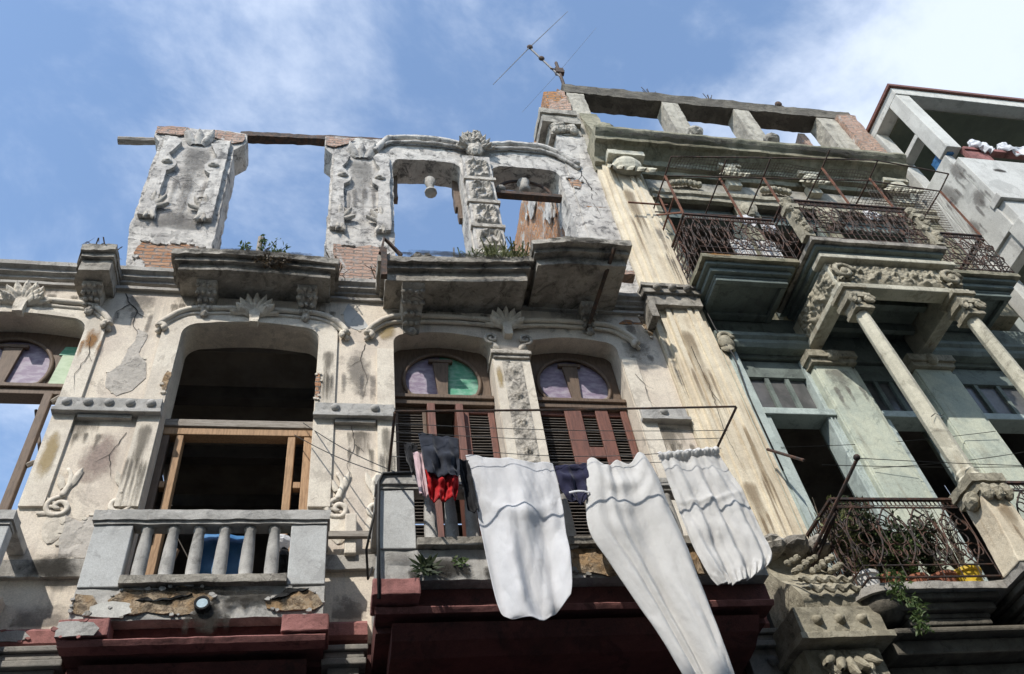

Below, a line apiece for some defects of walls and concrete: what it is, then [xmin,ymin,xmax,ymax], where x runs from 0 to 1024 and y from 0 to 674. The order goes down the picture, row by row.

peeling [525,201,563,229]
crack [116,293,145,334]
peeling [105,328,148,396]
spalling [313,372,322,400]
water stain [661,428,694,451]
water stain [744,474,782,534]
spalling [68,584,218,622]
spalling [264,585,325,613]